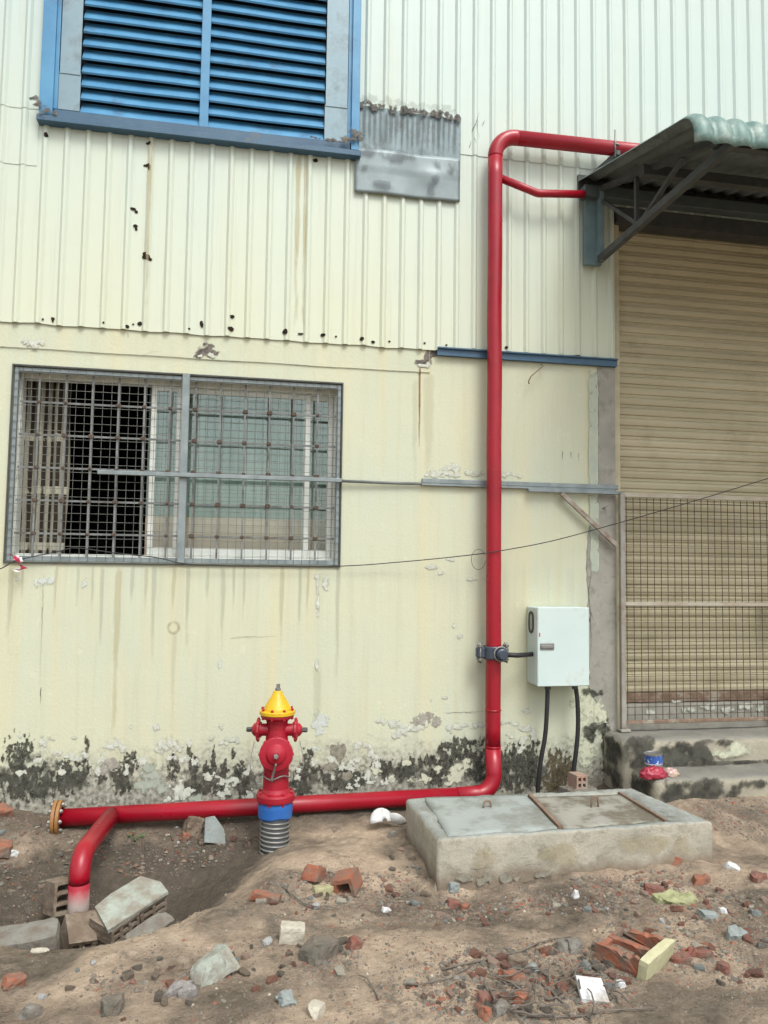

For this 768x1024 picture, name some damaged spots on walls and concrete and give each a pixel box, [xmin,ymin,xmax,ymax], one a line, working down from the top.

water stain [0,734,139,807]
water stain [167,746,257,799]
peeling [294,714,473,790]
water stain [289,736,486,796]
water stain [497,735,572,794]
water stain [584,718,768,803]